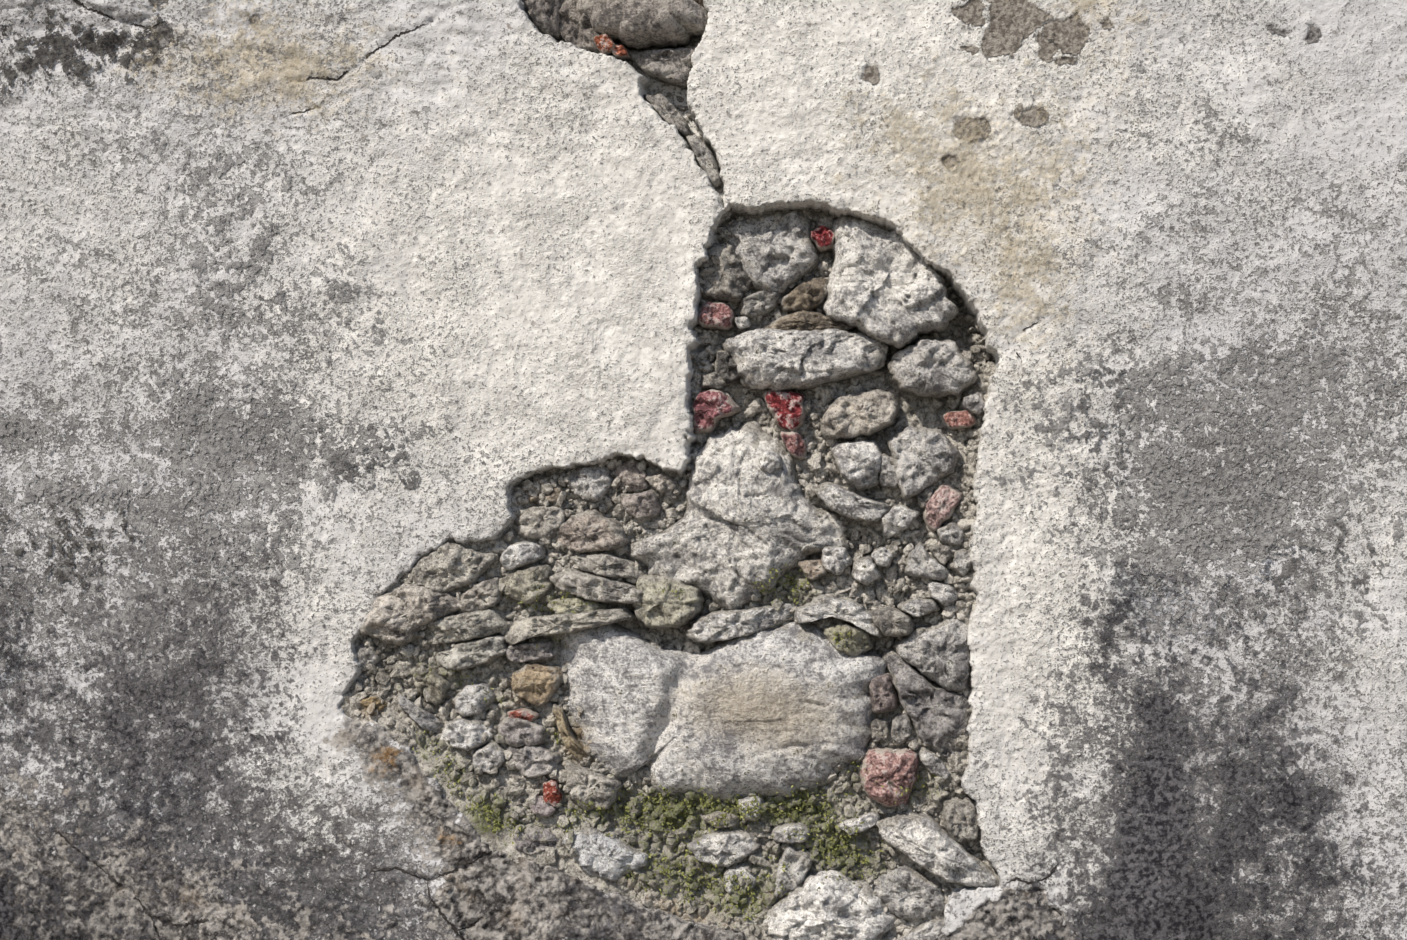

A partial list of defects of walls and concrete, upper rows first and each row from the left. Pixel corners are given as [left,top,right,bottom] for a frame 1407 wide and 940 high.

crack [283,21,433,118]
spalling [522,0,723,194]
peeling [862,65,879,84]
peeling [941,116,991,167]
peeling [1013,103,1049,127]
peeling [949,0,1114,65]
peeling [1267,25,1321,44]
peeling [11,89,420,595]
spalling [339,208,1407,940]
water stain [0,474,326,940]
water stain [1010,555,1391,940]
water stain [528,882,648,940]